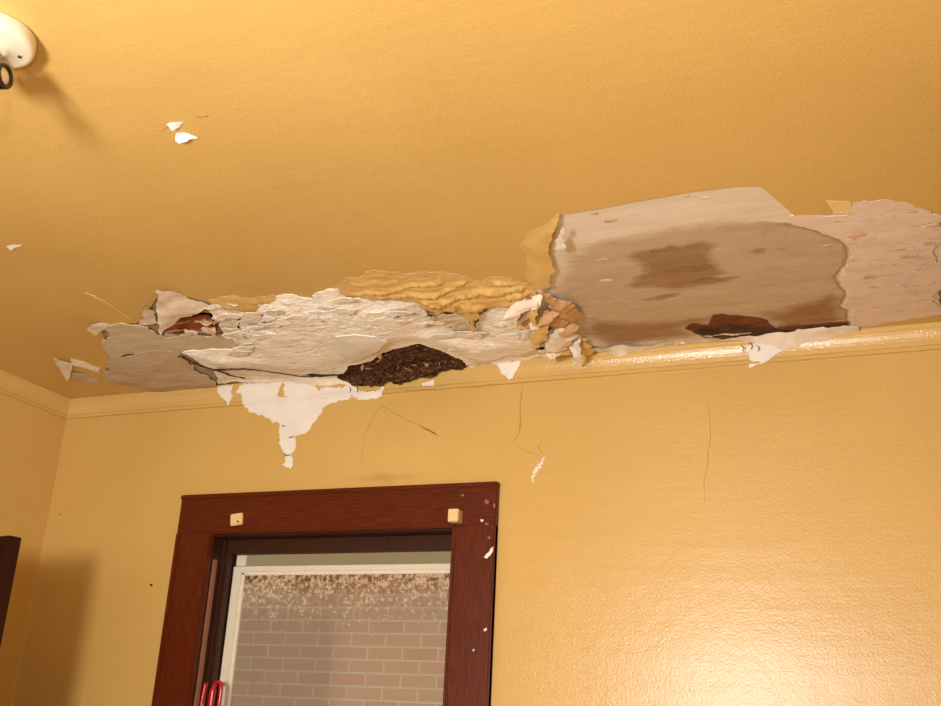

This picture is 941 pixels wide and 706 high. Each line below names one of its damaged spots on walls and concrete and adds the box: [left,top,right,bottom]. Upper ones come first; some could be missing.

peeling [158,122,198,144]
spalling [411,309,487,337]
damp [634,245,724,308]
flaking render [531,187,941,368]
damp [719,224,849,324]
flaking render [52,290,384,469]
peeling [497,361,521,380]
crack [514,388,545,482]